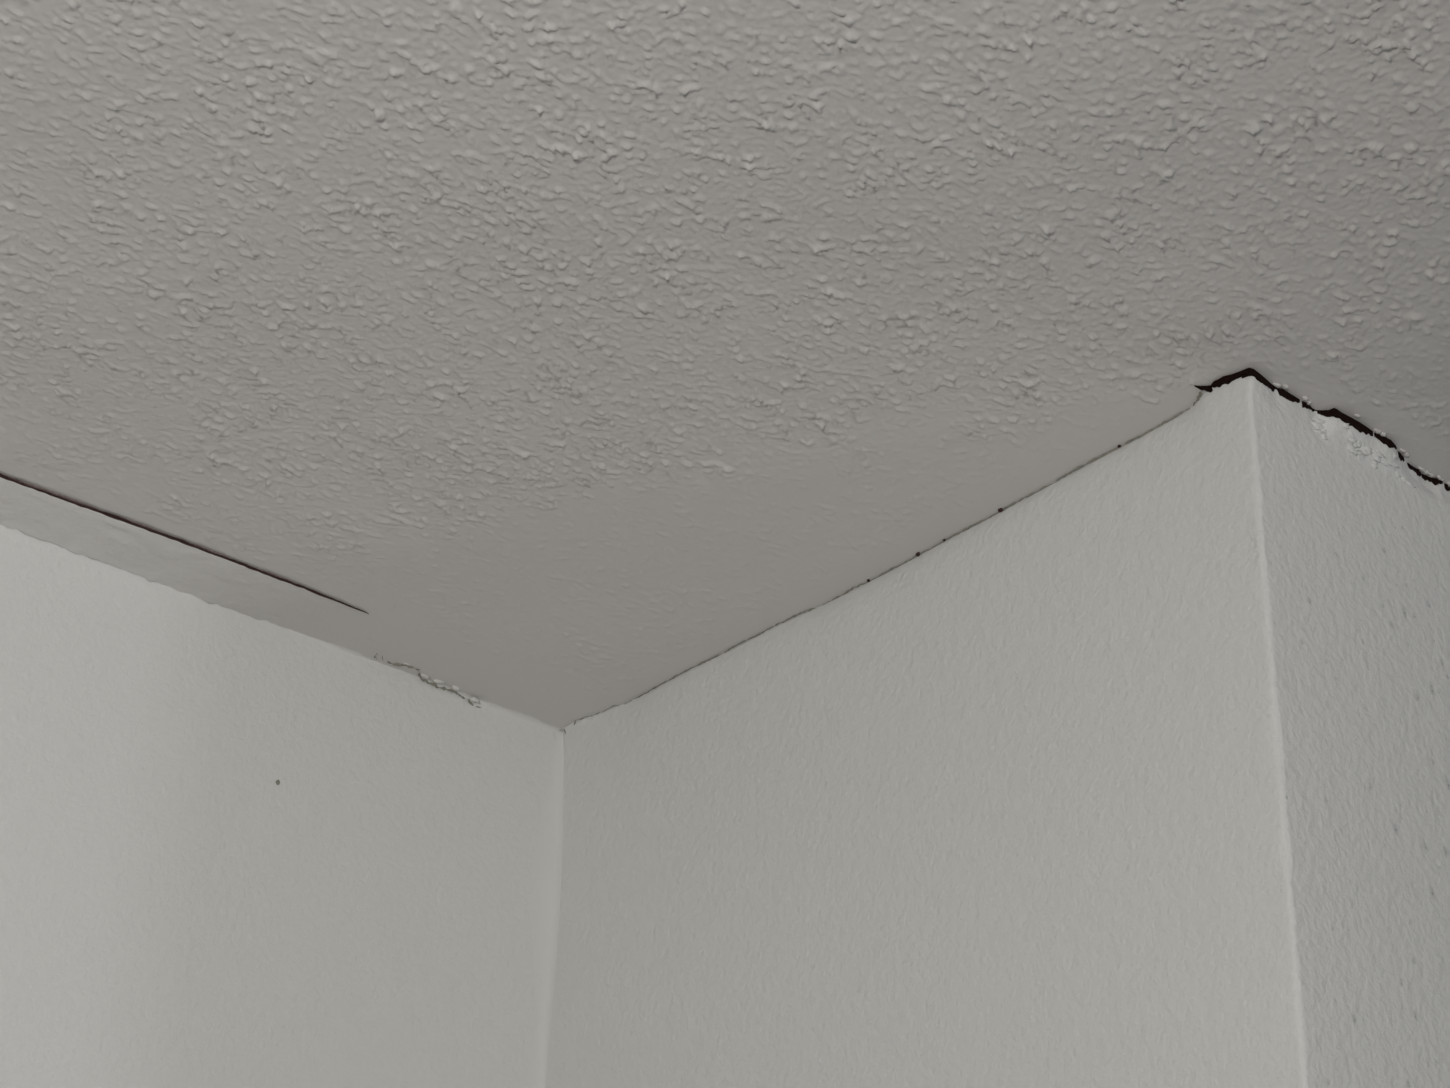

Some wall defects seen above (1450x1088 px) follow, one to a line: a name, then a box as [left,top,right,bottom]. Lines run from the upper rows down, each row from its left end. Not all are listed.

crack [0,473,369,614]
crack [563,367,1450,733]
crack [374,653,482,708]